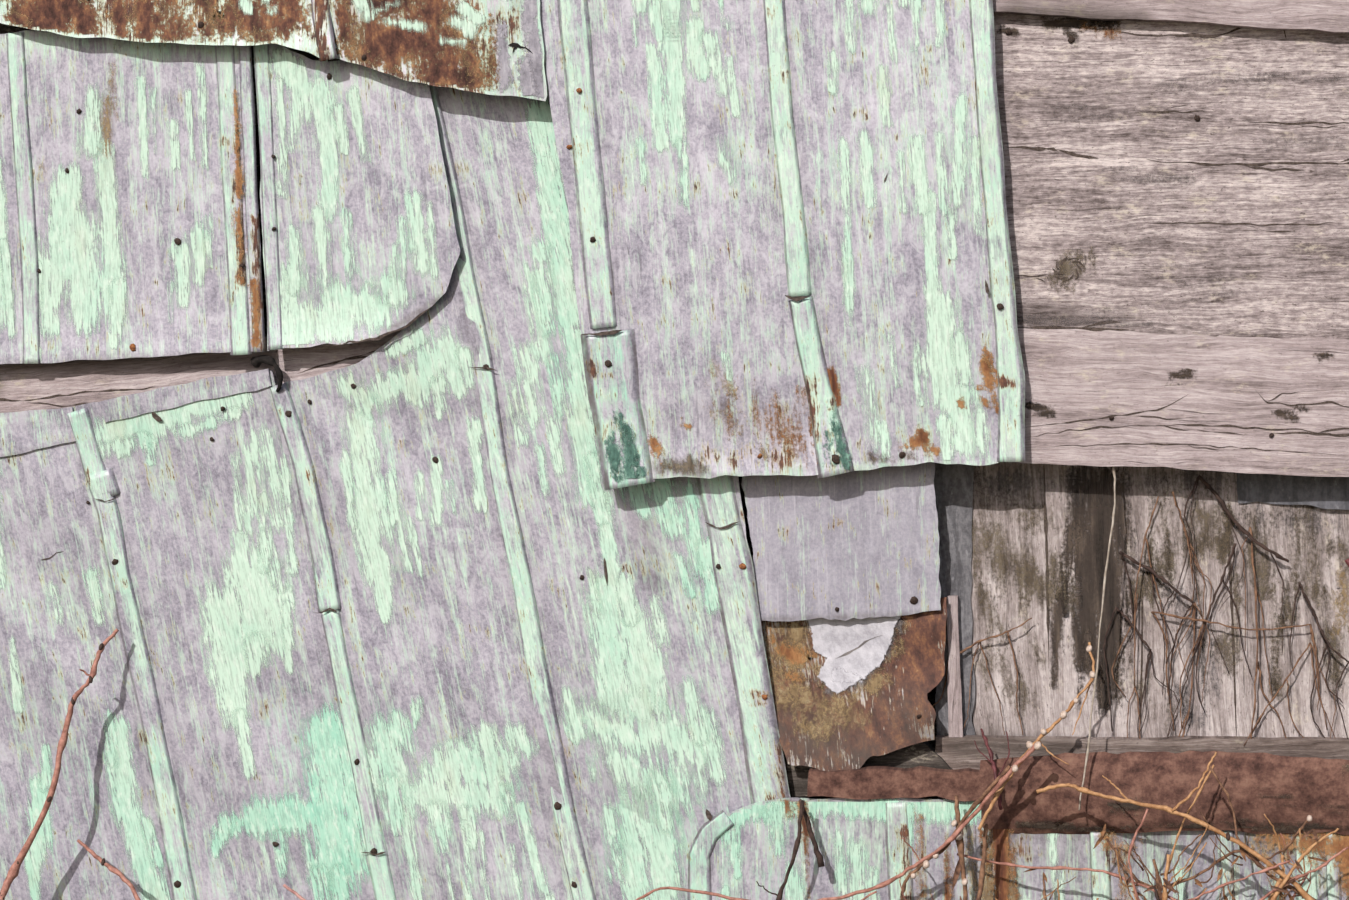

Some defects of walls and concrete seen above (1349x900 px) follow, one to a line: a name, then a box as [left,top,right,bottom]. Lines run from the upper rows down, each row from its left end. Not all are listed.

rust [0,0,313,44]
rust [334,0,501,91]
peeling [37,87,128,355]
peeling [269,48,474,623]
peeling [440,0,740,900]
rust [827,366,841,406]
peeling [94,392,369,900]
damp [972,466,1349,715]
peeling [366,696,555,900]
peeling [720,799,981,900]
rust [783,766,981,900]
rust [943,799,1210,900]